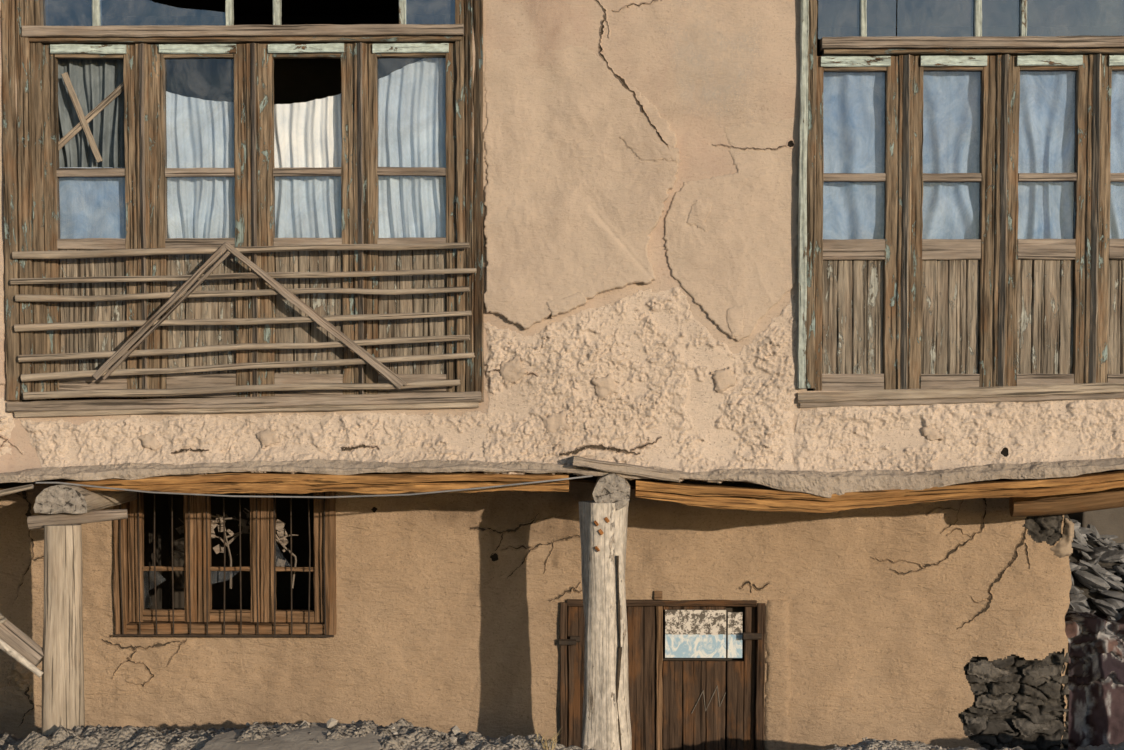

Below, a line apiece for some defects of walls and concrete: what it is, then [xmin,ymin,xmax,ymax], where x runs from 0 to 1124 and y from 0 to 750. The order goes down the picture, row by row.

crack [594,0,669,148]
spalling [0,45,1124,483]
crack [14,490,44,601]
crack [470,512,582,602]
crack [871,498,988,576]
crack [956,528,1031,630]
spalling [1022,514,1074,558]
crack [6,667,42,728]
crack [102,638,187,687]
spalling [958,643,1069,750]